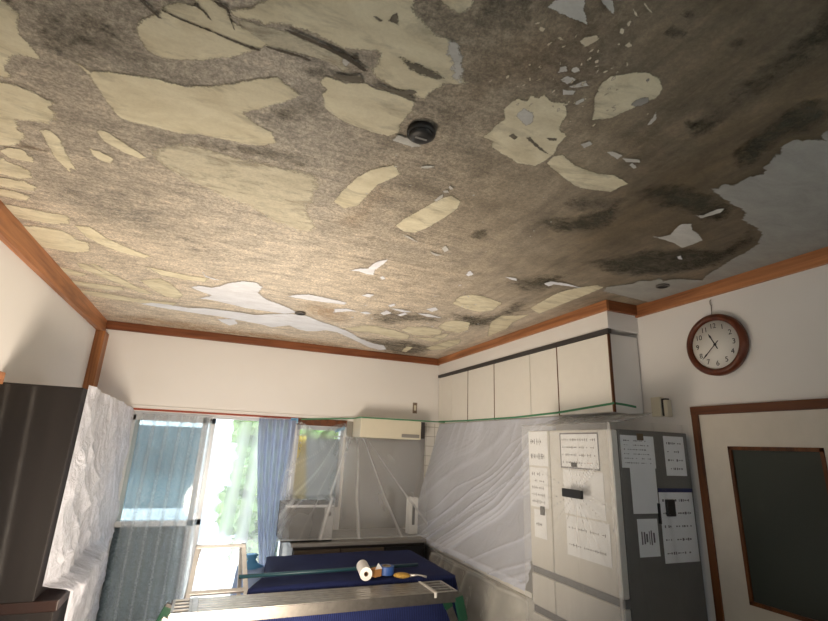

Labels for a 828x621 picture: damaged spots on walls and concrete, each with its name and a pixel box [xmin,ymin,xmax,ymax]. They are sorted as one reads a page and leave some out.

peeling [547,0,588,25]
crack [140,0,367,72]
peeling [446,42,464,83]
peeling [552,35,628,112]
peeling [393,135,421,147]
damp [545,200,613,232]
damp [646,186,727,219]
peeling [604,123,828,302]
damp [592,238,752,275]
peeling [141,272,441,350]
damp [456,314,498,325]